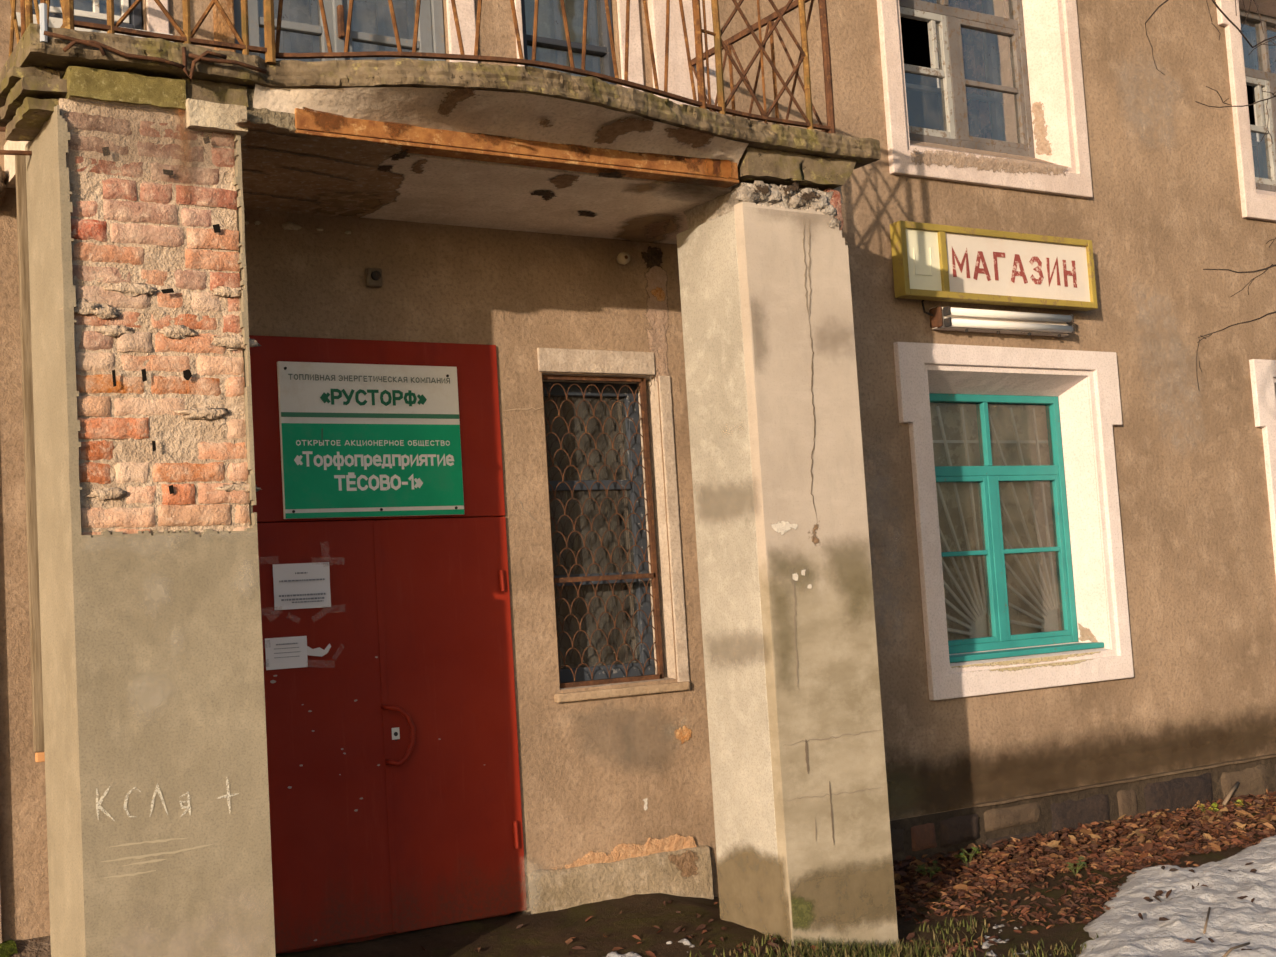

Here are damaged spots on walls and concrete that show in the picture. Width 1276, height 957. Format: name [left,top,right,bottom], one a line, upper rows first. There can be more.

corrosion [303,107,346,132]
corrosion [475,133,505,145]
corrosion [567,144,589,157]
flaking render [594,117,714,148]
corrosion [619,150,733,179]
peeling [910,102,1067,175]
spalling [684,180,843,230]
flaking render [61,112,428,535]
crack [792,219,819,693]
damp [886,718,1276,813]
flaking render [552,834,699,878]
damp [717,848,896,952]